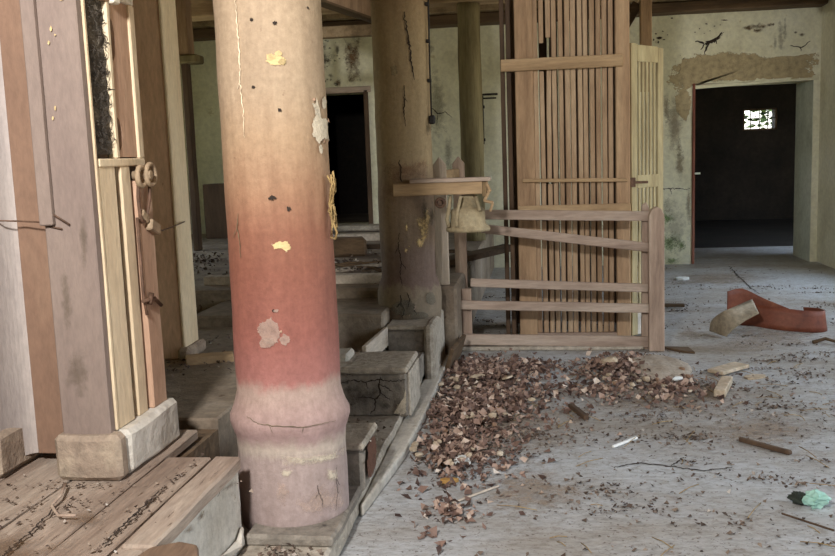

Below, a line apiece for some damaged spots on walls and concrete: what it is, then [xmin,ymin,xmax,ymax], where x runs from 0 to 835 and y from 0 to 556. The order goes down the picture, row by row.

spalling [266,50,286,66]
water stain [336,38,359,81]
crack [403,12,415,126]
crack [679,32,722,71]
spalling [663,46,819,121]
peeling [312,97,329,154]
spalling [271,241,291,252]
spalling [257,309,290,348]
crack [342,377,405,414]